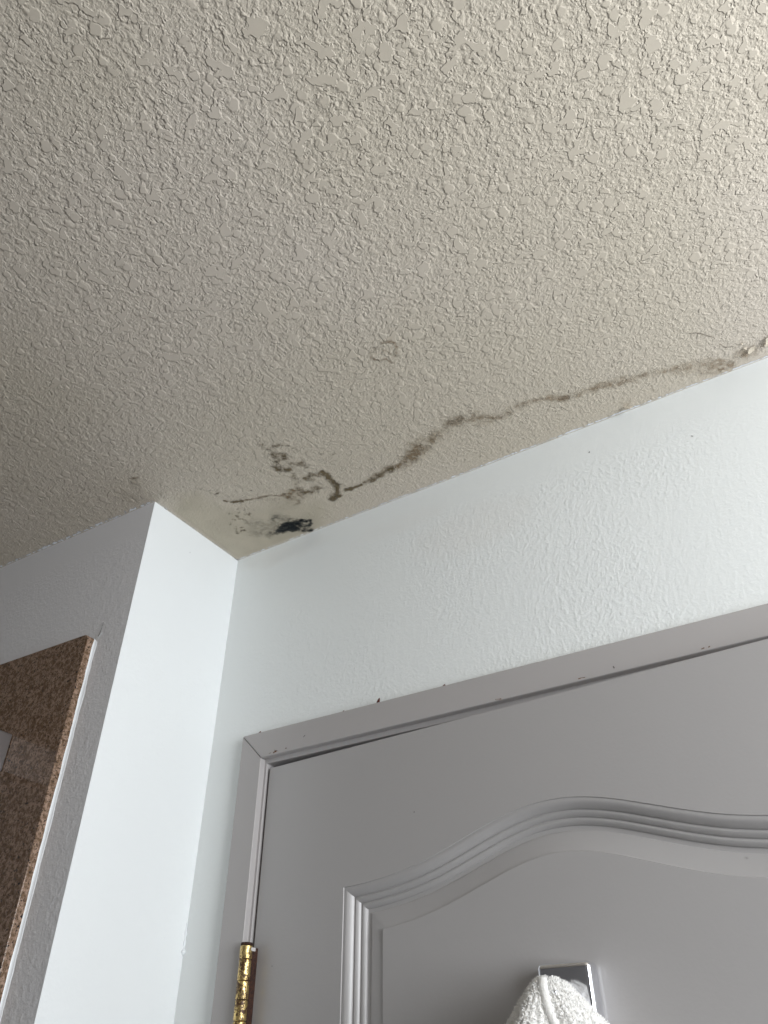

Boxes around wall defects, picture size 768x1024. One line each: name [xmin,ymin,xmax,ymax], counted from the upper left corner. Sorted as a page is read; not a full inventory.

damp [216,438,435,535]